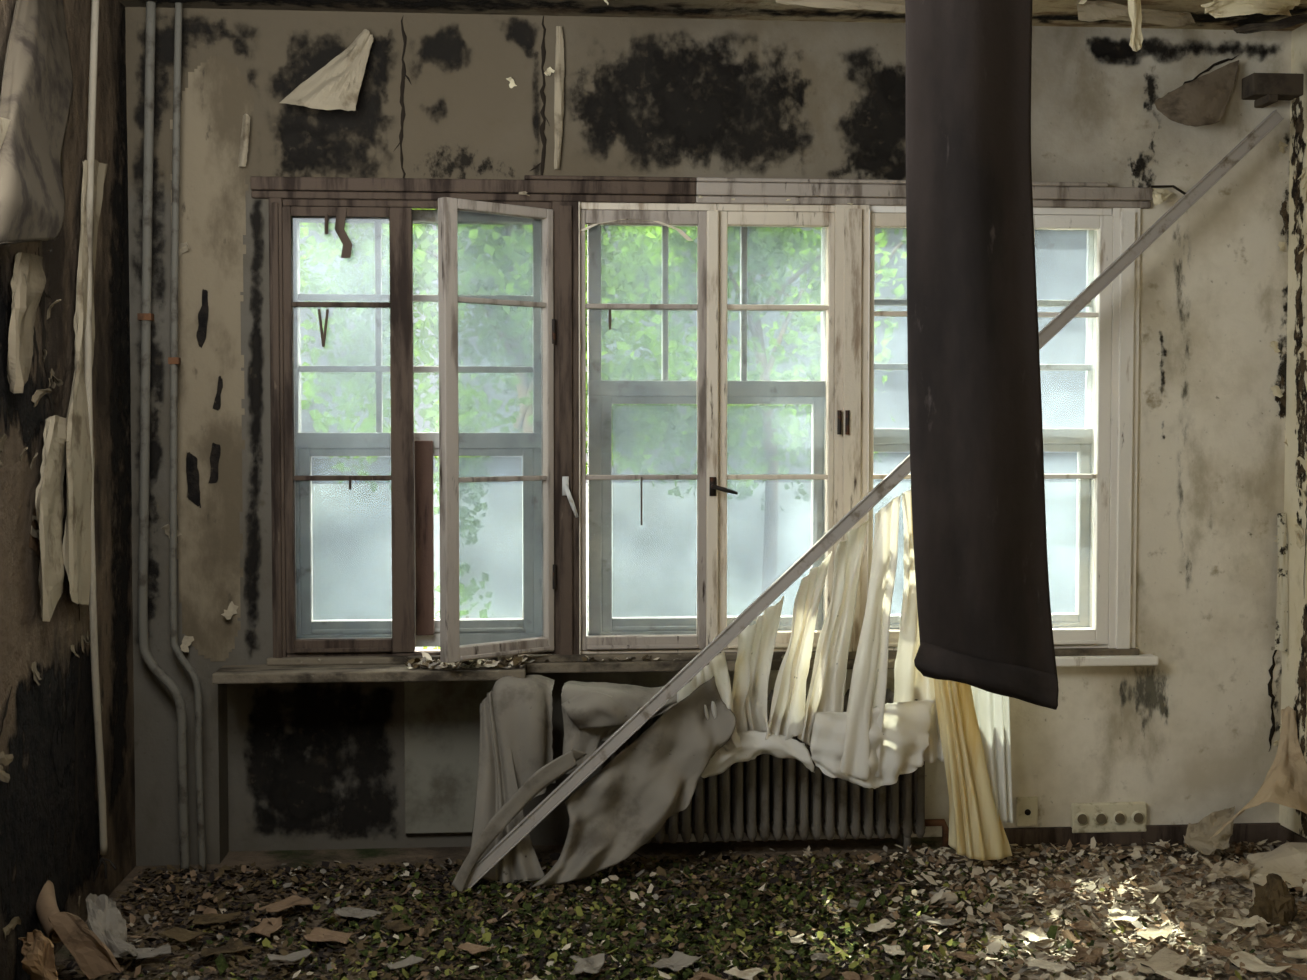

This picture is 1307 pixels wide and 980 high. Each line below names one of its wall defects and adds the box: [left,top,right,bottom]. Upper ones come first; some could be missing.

water stain [1032,7,1307,115]
peeling [1076,0,1307,51]
water stain [1131,141,1153,188]
peeling [0,265,56,470]
water stain [109,0,906,812]
water stain [1270,285,1288,418]
peeling [1290,97,1307,573]
peeling [29,505,41,558]
water stain [244,683,396,839]
water stain [1268,650,1282,751]
peeling [1293,604,1307,763]
peeling [1296,809,1307,837]